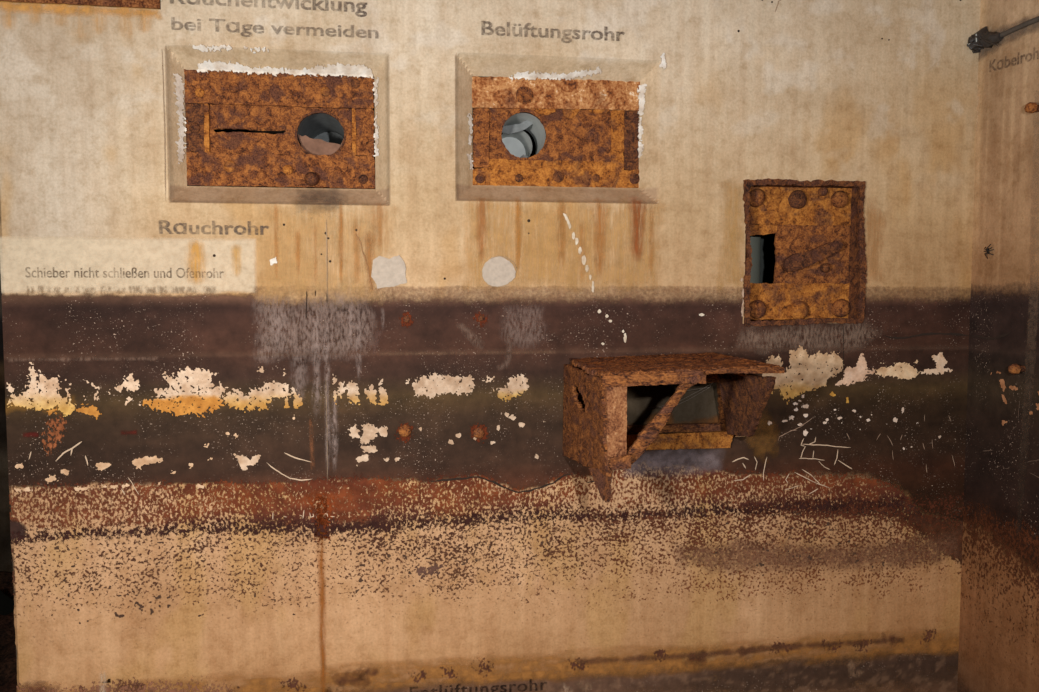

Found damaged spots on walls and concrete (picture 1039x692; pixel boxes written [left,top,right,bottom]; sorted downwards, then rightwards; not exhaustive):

corrosion [473,201,653,284]
damp [1,287,1039,624]
peeling [990,371,1018,404]
corrosion [9,461,1039,692]